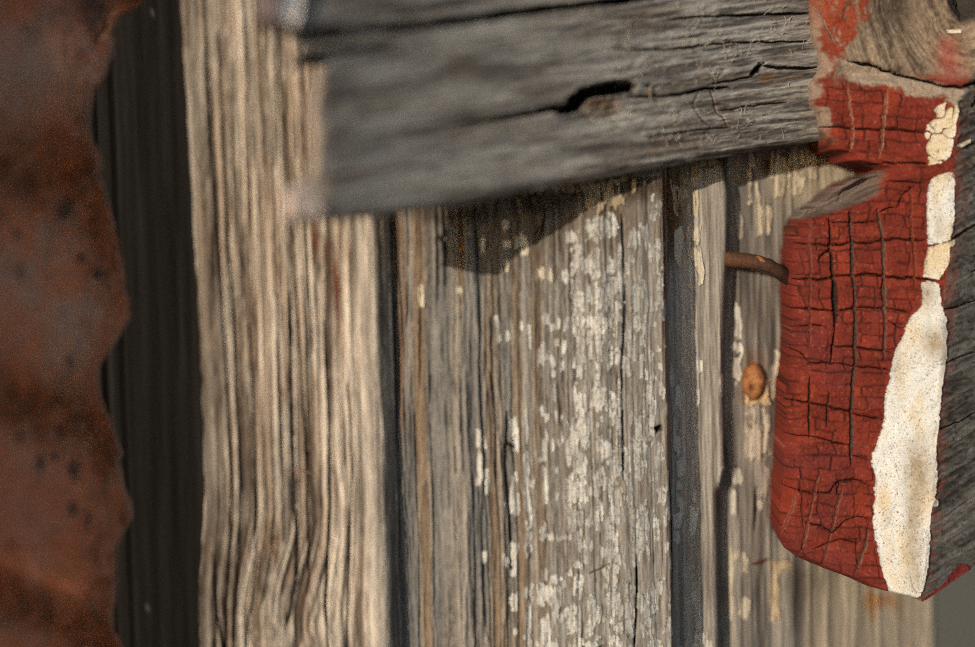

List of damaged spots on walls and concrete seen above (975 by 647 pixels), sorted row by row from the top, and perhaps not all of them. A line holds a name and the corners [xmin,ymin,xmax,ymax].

crack [295,0,651,67]
crack [450,104,562,128]
crack [534,200,546,244]
crack [203,0,353,647]
peeling [475,428,490,494]
crack [475,226,512,626]
peeling [494,158,720,647]
crack [616,4,975,576]
peeling [871,102,975,600]
crack [667,476,675,595]
crack [631,564,639,647]